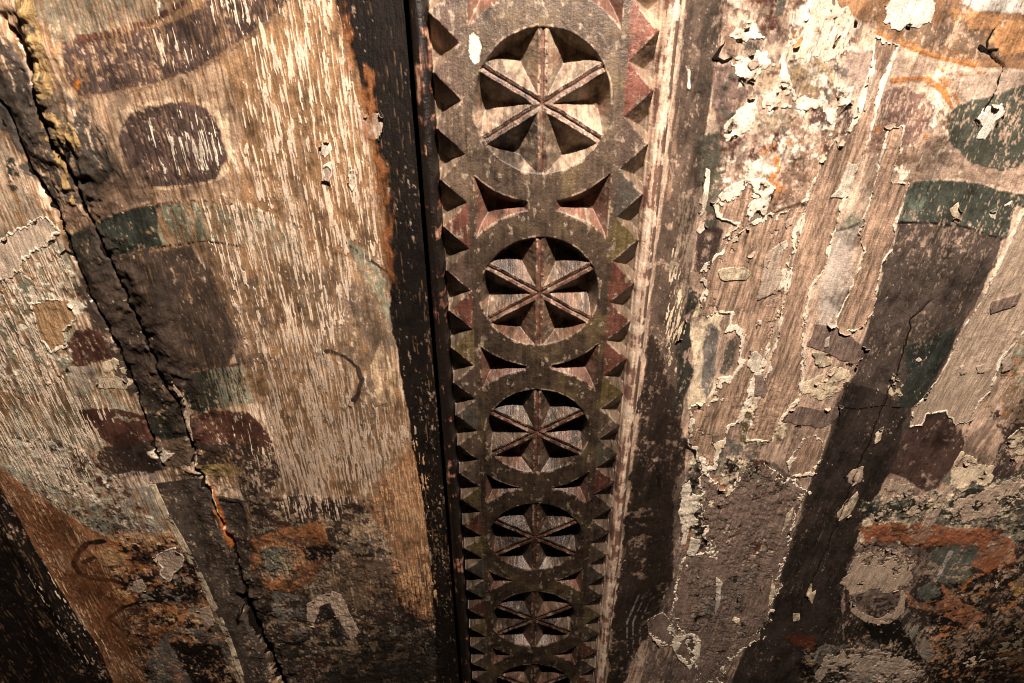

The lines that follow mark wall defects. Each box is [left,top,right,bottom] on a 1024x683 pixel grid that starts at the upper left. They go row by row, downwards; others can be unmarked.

crack [978,29,1004,112]
peeling [0,216,134,500]
crack [0,99,287,681]
peeling [647,0,936,683]
crack [799,301,930,614]
peeling [840,451,1024,625]
peeling [910,201,1024,428]
peeling [1005,427,1024,462]
peeling [963,626,1024,681]